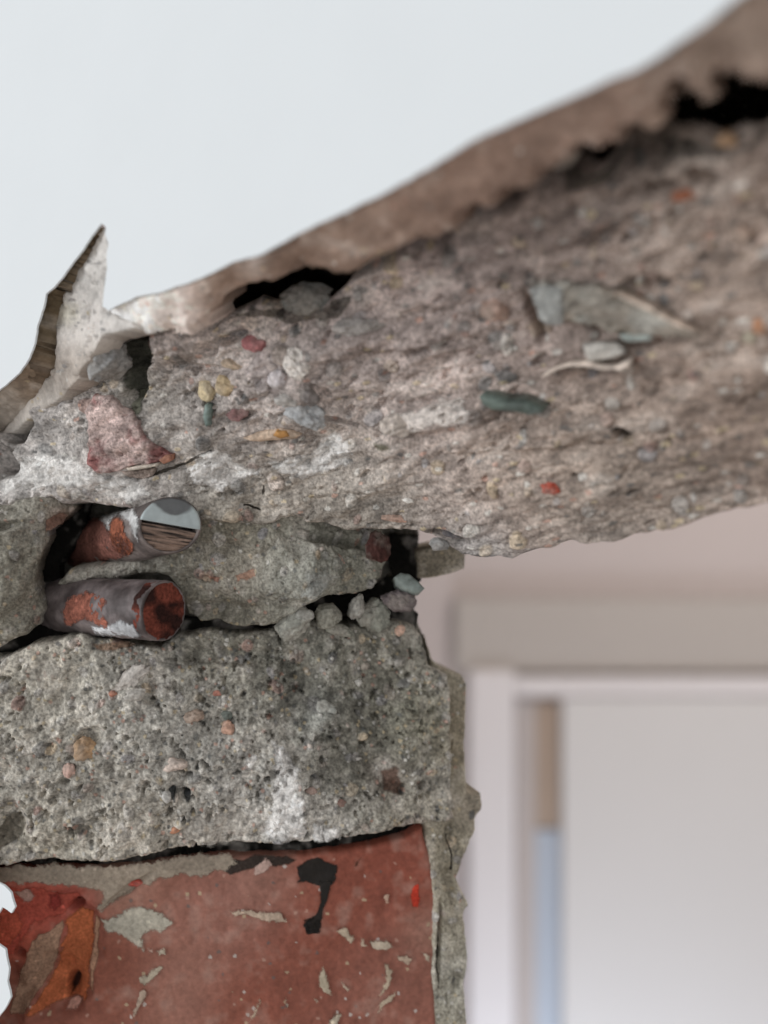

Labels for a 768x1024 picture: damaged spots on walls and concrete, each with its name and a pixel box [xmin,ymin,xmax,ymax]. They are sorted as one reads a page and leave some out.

spalling [671,73,768,151]
spalling [565,140,629,192]
spalling [233,265,356,324]
spalling [4,228,158,435]
peeling [529,279,702,377]
rust [46,513,67,531]
rust [67,517,134,567]
rust [63,591,108,629]
rust [131,581,184,640]
spalling [0,812,25,848]
crack [14,824,413,864]
spalling [0,887,100,1016]